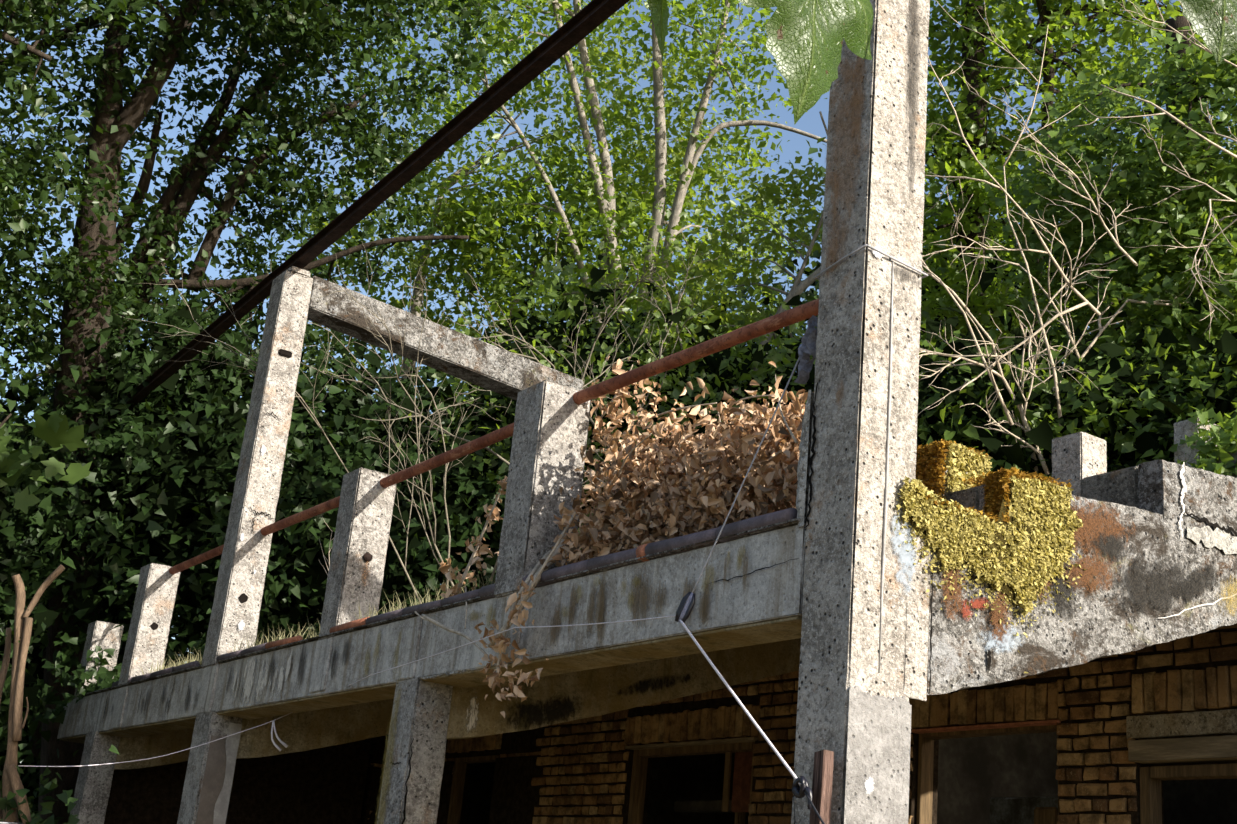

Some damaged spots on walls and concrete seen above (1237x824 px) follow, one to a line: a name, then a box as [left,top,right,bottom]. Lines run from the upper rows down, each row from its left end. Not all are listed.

crack [1178,462,1237,543]
leakage [1050,558,1076,616]
leakage [1089,533,1219,612]
crack [1162,593,1237,618]
leakage [226,647,306,703]
leakage [329,642,348,679]